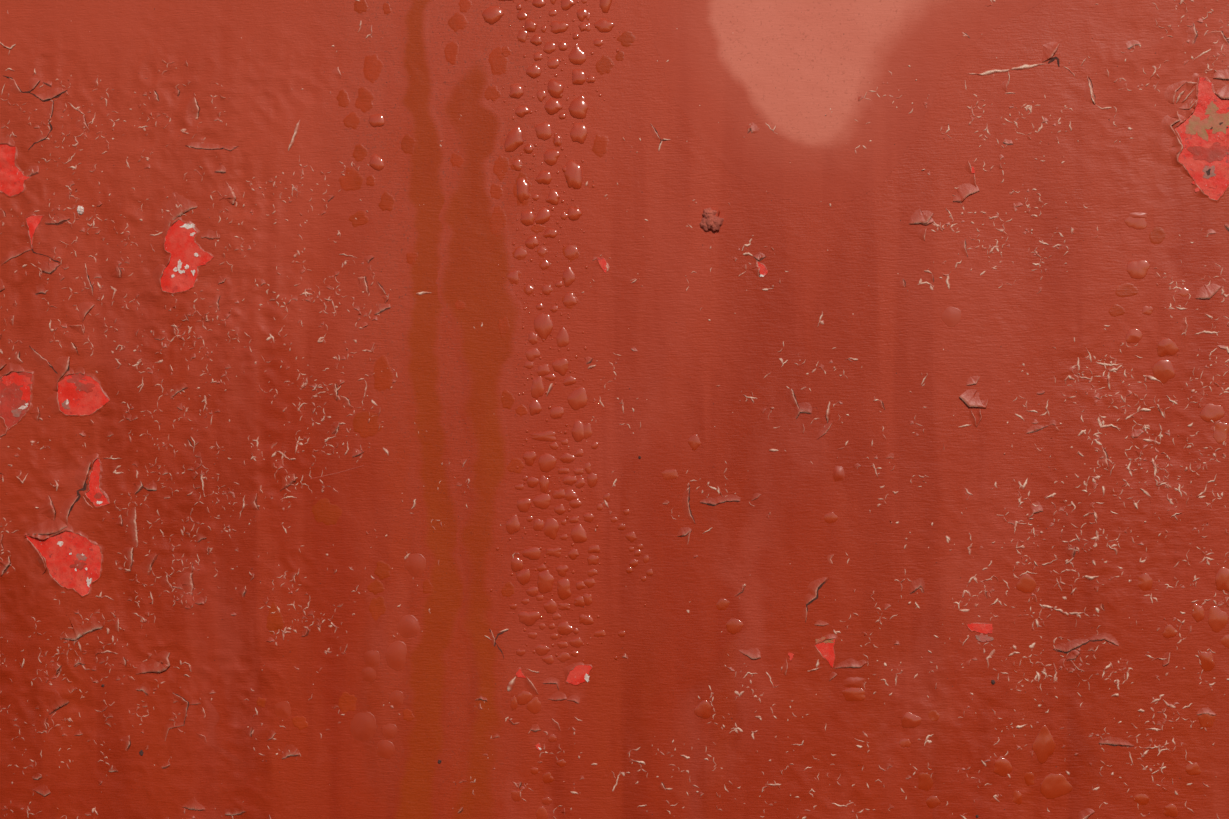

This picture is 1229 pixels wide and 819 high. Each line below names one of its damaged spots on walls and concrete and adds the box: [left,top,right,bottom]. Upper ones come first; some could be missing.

peeling [1096,0,1229,203]
peeling [733,235,789,291]
peeling [0,60,406,819]
leakage [0,0,580,819]
peeling [740,341,862,452]
peeling [808,263,1229,819]
peeling [507,667,539,695]
peeling [490,717,564,763]
peeling [564,662,593,686]
peeling [612,739,741,817]
peeling [698,648,933,819]